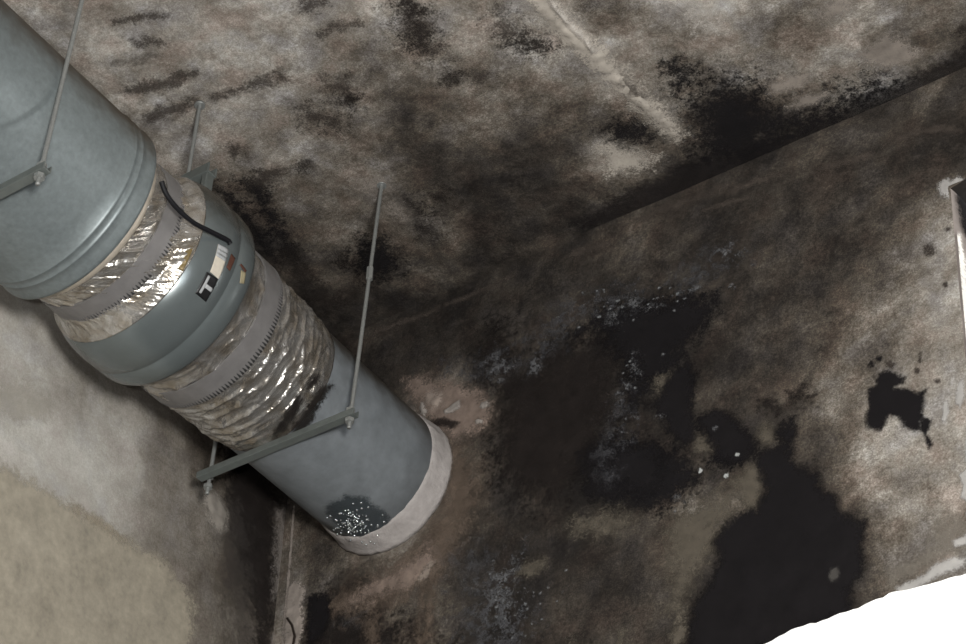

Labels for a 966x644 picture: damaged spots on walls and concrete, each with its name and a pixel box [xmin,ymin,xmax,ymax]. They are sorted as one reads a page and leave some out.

damp [373,0,445,61]
damp [479,11,561,54]
damp [125,70,197,123]
damp [575,46,966,227]
damp [212,159,346,315]
damp [335,225,411,287]
damp [946,194,966,332]
damp [864,354,941,449]
damp [464,282,868,644]
damp [0,467,196,644]
damp [327,496,390,537]
damp [302,540,442,644]